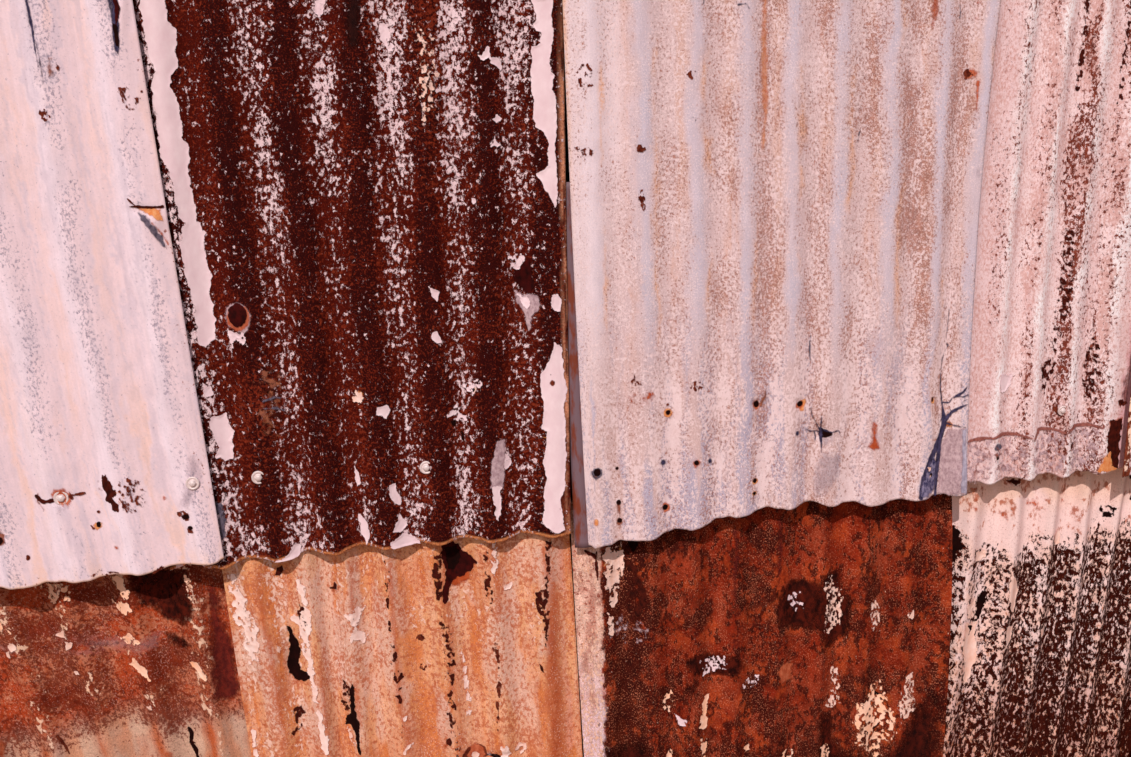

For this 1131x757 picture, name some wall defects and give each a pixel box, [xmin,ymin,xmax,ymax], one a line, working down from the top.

peeling [530,0,558,208]
peeling [139,0,246,357]
corrosion [508,253,540,331]
corrosion [1041,228,1075,389]
peeling [209,412,235,461]
peeling [490,440,512,521]
peeling [540,342,568,533]
corrosion [1098,374,1128,473]
corrosion [92,566,193,648]
corrosion [535,541,552,646]
corrosion [776,519,853,652]
peeling [852,672,915,757]